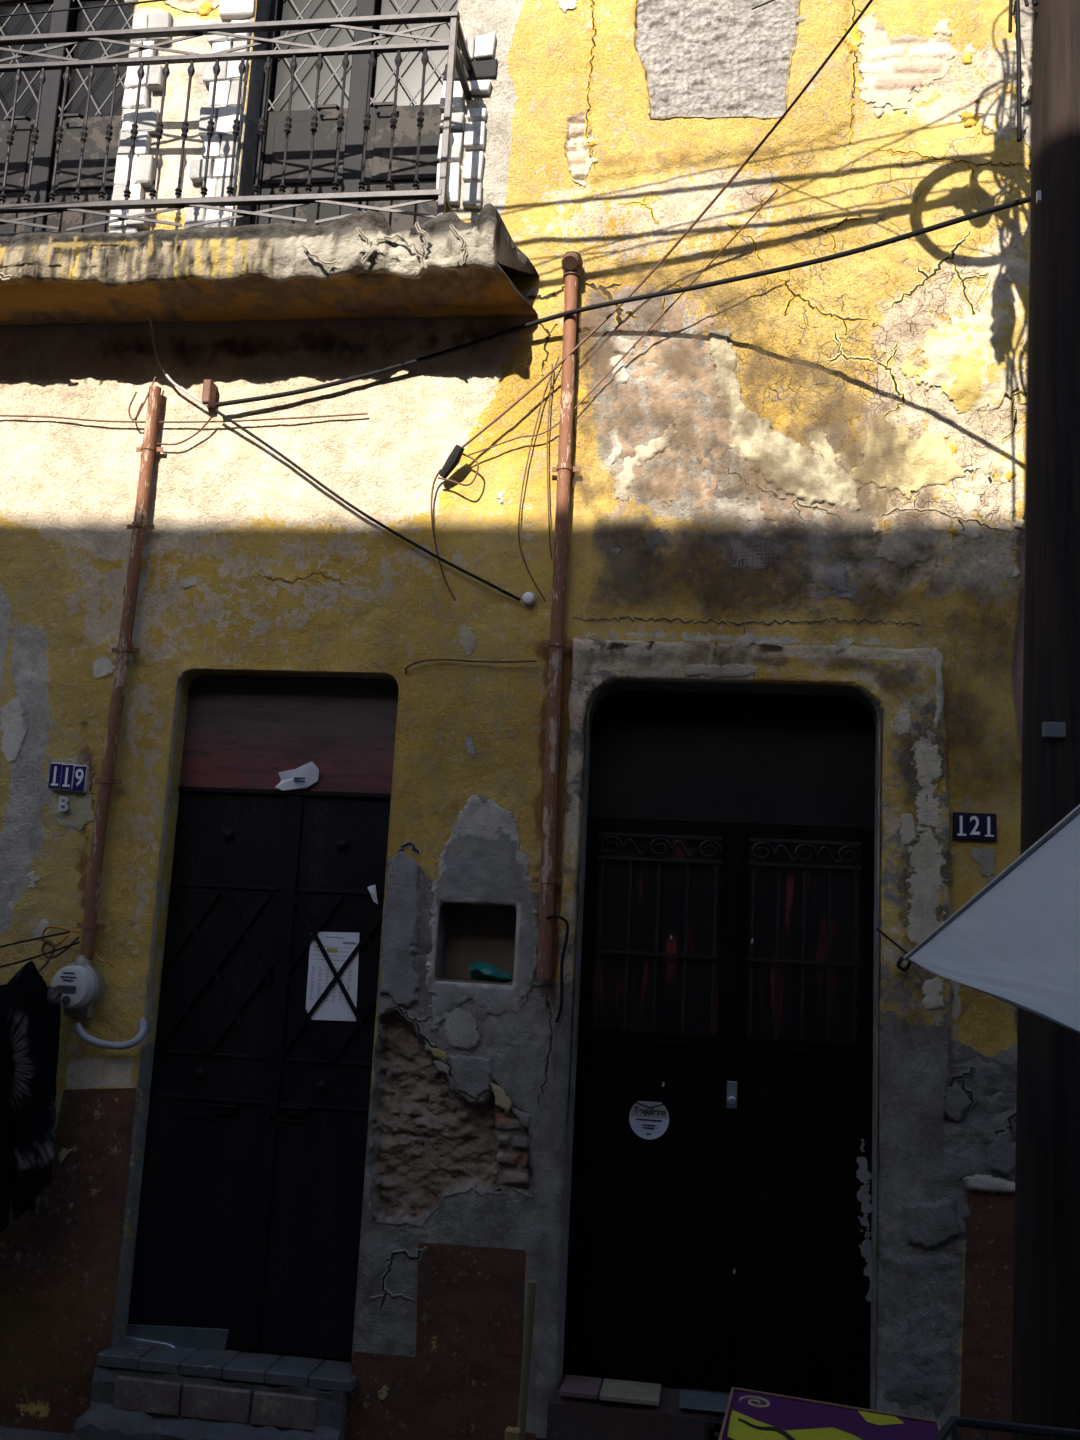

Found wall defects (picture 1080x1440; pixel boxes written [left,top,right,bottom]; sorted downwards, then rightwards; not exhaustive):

flaking render [564,111,598,186]
crack [584,0,598,170]
crack [617,191,659,223]
flaking render [840,0,1034,170]
flaking render [577,281,1026,621]
peeling [0,698,27,762]
corrosion [534,640,572,996]
peeling [584,629,948,944]
flaking render [366,851,533,1227]
crack [371,1246,428,1314]